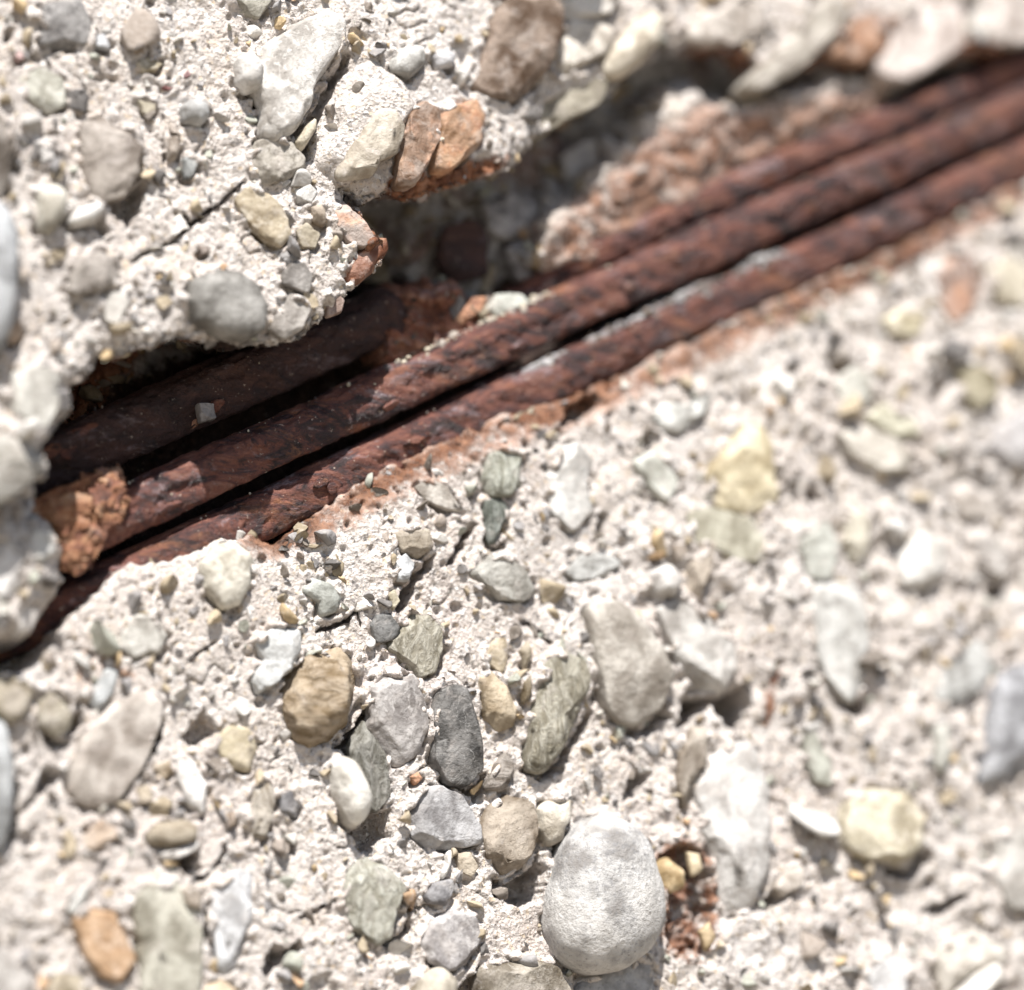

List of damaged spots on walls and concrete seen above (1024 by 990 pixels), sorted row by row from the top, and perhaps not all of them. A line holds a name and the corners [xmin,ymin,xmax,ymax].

rust [927,35,1014,72]
rust [376,154,508,202]
rust [543,15,899,265]
rust [58,338,191,425]
spalling [0,40,1024,674]
rust [239,186,1024,560]
rust [31,464,130,576]